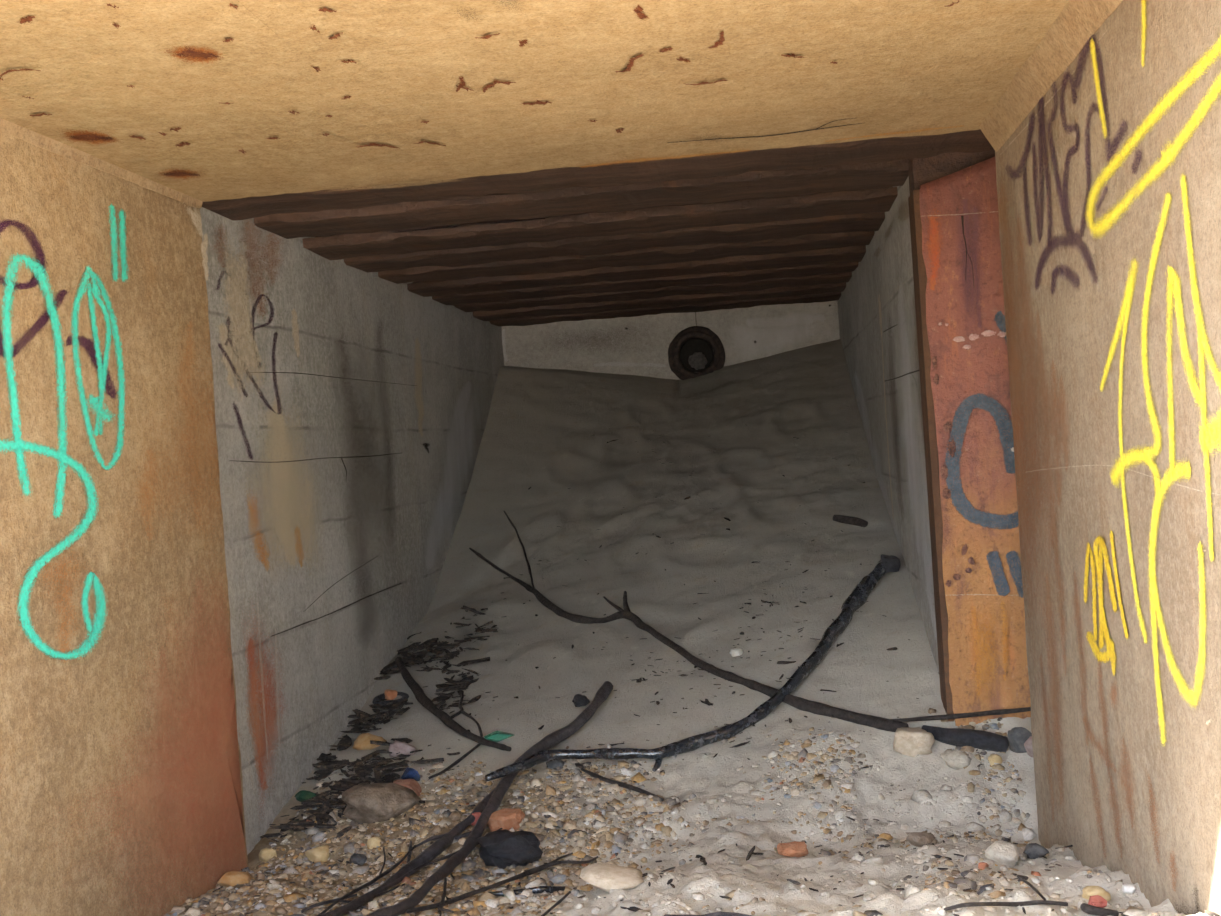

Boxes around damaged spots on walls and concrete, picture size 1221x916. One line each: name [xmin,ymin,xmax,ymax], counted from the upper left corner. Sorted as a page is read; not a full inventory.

rust [163,37,234,65]
rust [63,130,146,145]
rust [156,168,205,181]
rust [1040,523,1178,892]